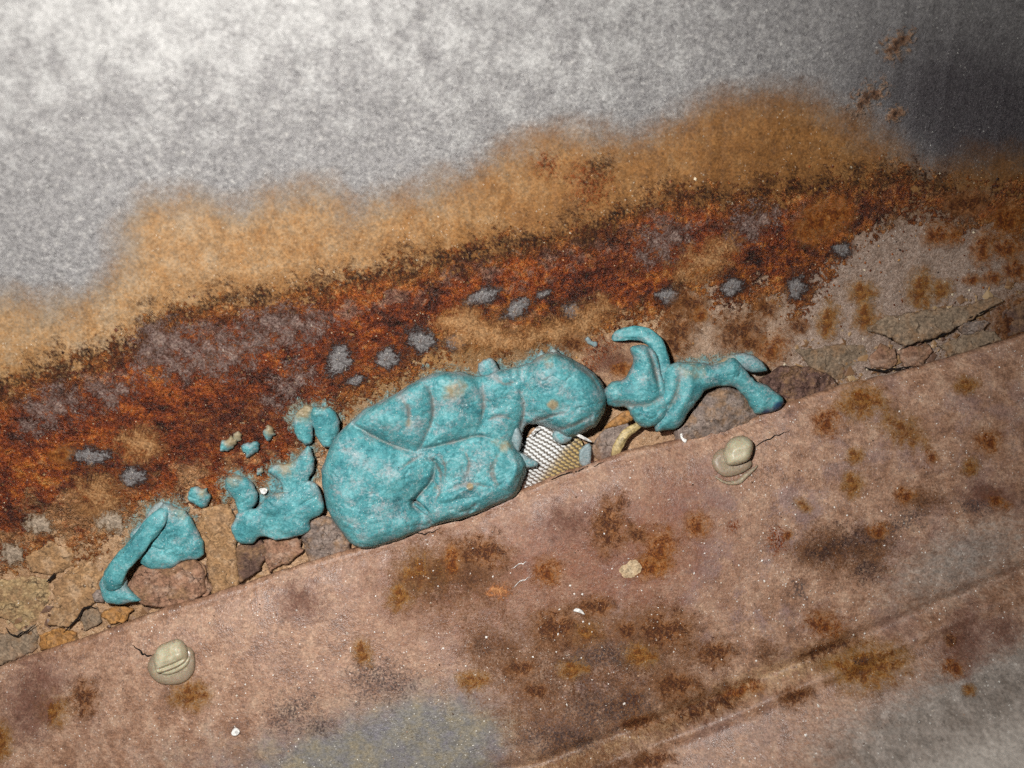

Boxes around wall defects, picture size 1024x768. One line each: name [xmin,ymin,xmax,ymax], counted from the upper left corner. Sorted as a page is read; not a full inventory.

water stain [0,93,1024,419]
spalling [782,270,810,303]
spalling [830,237,853,260]
corrosion [0,150,1024,587]
peeling [795,297,1024,382]
crack [865,303,1003,372]
peeling [195,503,304,597]
peeling [0,541,134,665]
corrosion [384,492,767,768]
corrosion [779,686,816,711]
corrosion [757,610,912,697]
corrosion [942,614,1014,697]